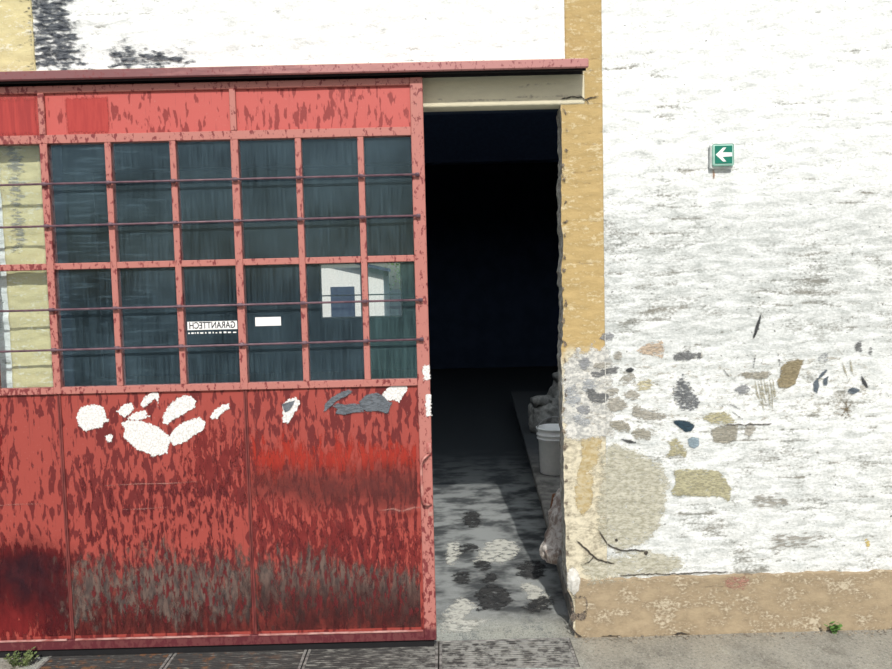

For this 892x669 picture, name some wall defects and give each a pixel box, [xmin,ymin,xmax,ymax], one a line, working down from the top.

water stain [21,0,92,70]
water stain [108,39,196,68]
flaking render [561,340,682,584]
peeling [0,418,422,638]
crack [577,532,726,576]